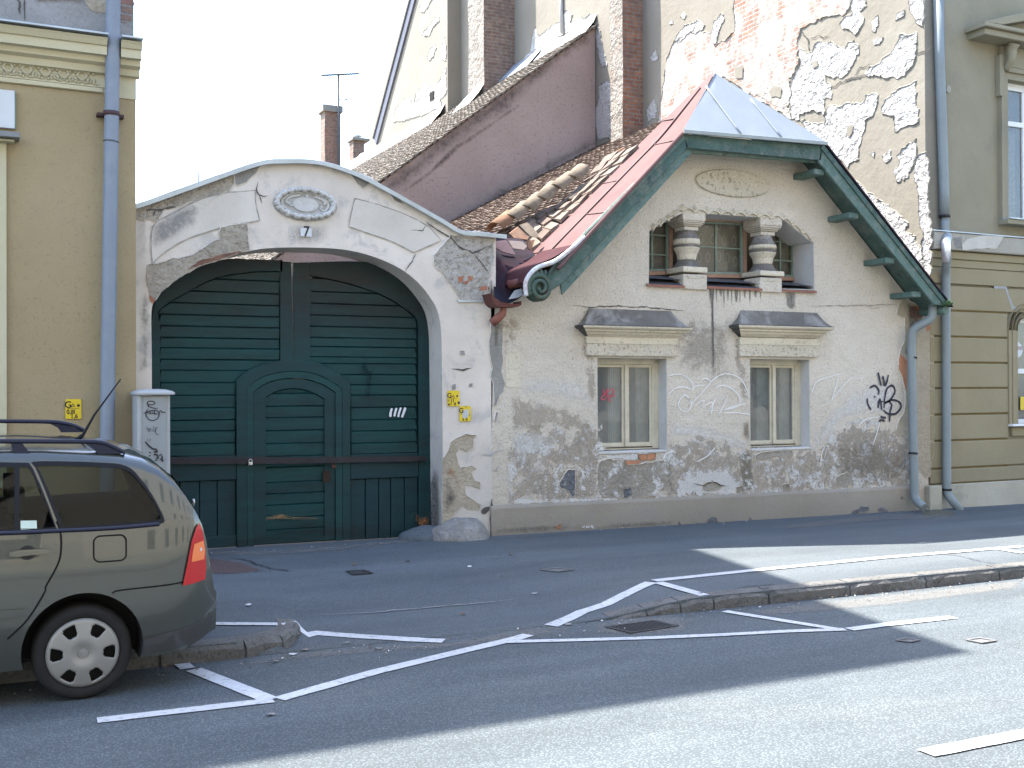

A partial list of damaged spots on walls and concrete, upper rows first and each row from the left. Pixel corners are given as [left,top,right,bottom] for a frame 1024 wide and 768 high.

flaking render [647,0,933,277]
flaking render [136,166,261,223]
flaking render [146,223,250,304]
flaking render [432,234,494,301]
flaking render [508,299,935,504]
flaking render [441,434,490,523]